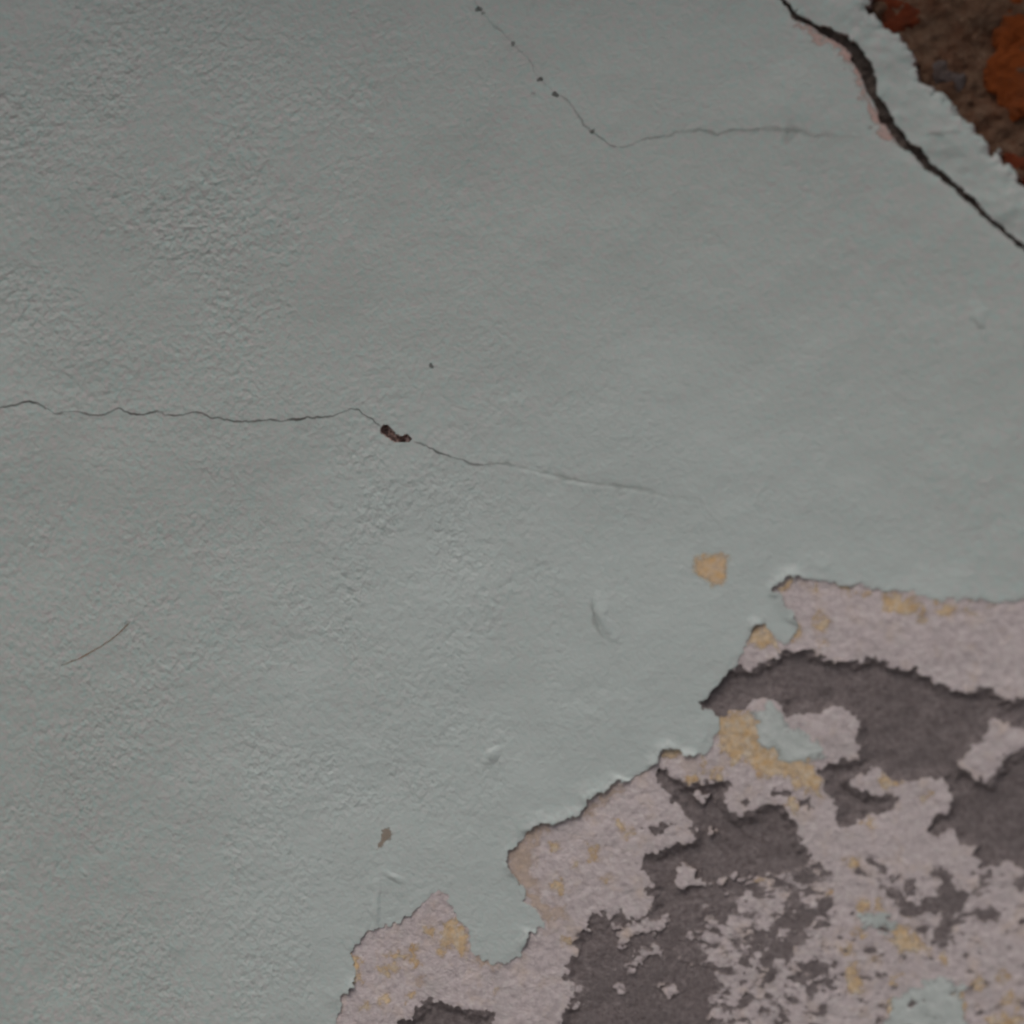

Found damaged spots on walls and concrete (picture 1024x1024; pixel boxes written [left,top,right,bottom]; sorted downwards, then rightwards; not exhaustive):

crack [781,0,1024,249]
flaking render [795,0,1024,244]
crack [3,400,36,408]
crack [358,409,412,442]
peeling [693,553,727,585]
peeling [336,575,1024,1024]